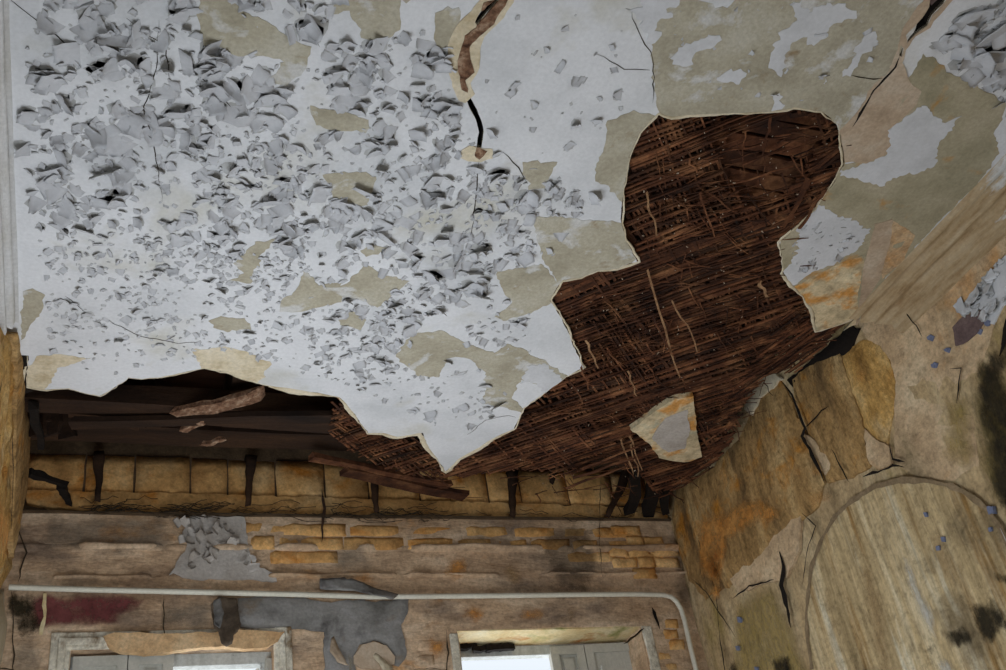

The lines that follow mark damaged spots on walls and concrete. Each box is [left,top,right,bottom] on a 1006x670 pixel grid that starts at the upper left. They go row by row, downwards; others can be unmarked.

crack [852,0,952,126]
crack [448,0,526,236]
peeling [371,159,397,189]
peeling [71,246,116,284]
peeling [132,234,163,252]
crack [783,383,904,483]
leakage [976,350,1006,506]
peeling [169,514,507,583]
peeling [319,577,398,600]
crack [692,514,816,670]
leakage [729,593,802,670]
leakage [947,602,1006,647]